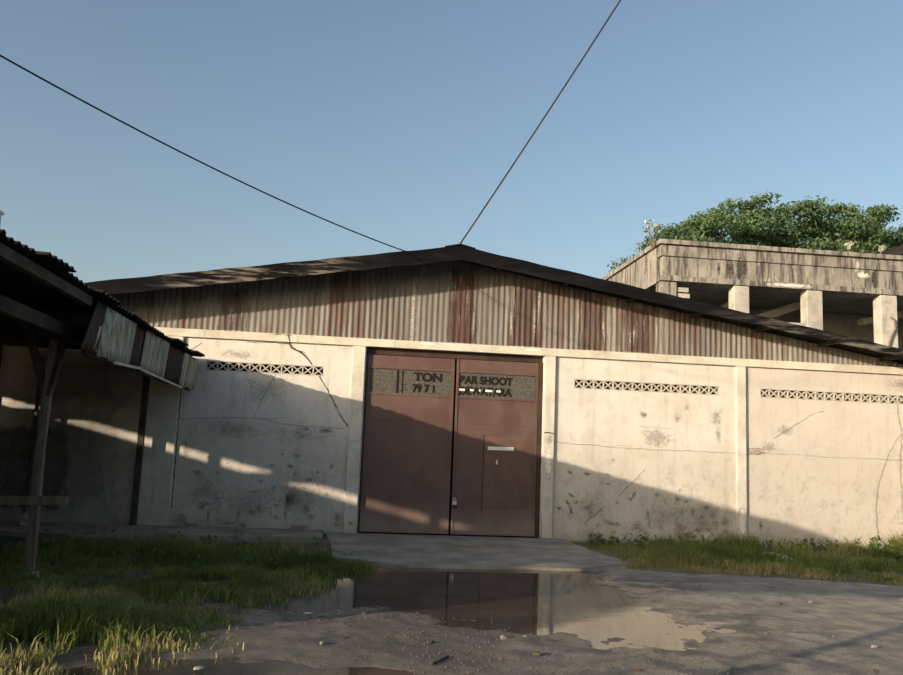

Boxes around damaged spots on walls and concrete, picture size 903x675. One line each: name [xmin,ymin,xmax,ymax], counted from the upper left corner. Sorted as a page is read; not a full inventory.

leakage [717,262,747,278]
rust [447,272,476,343]
rust [510,286,547,347]
rust [602,310,657,352]
crack [252,336,348,427]